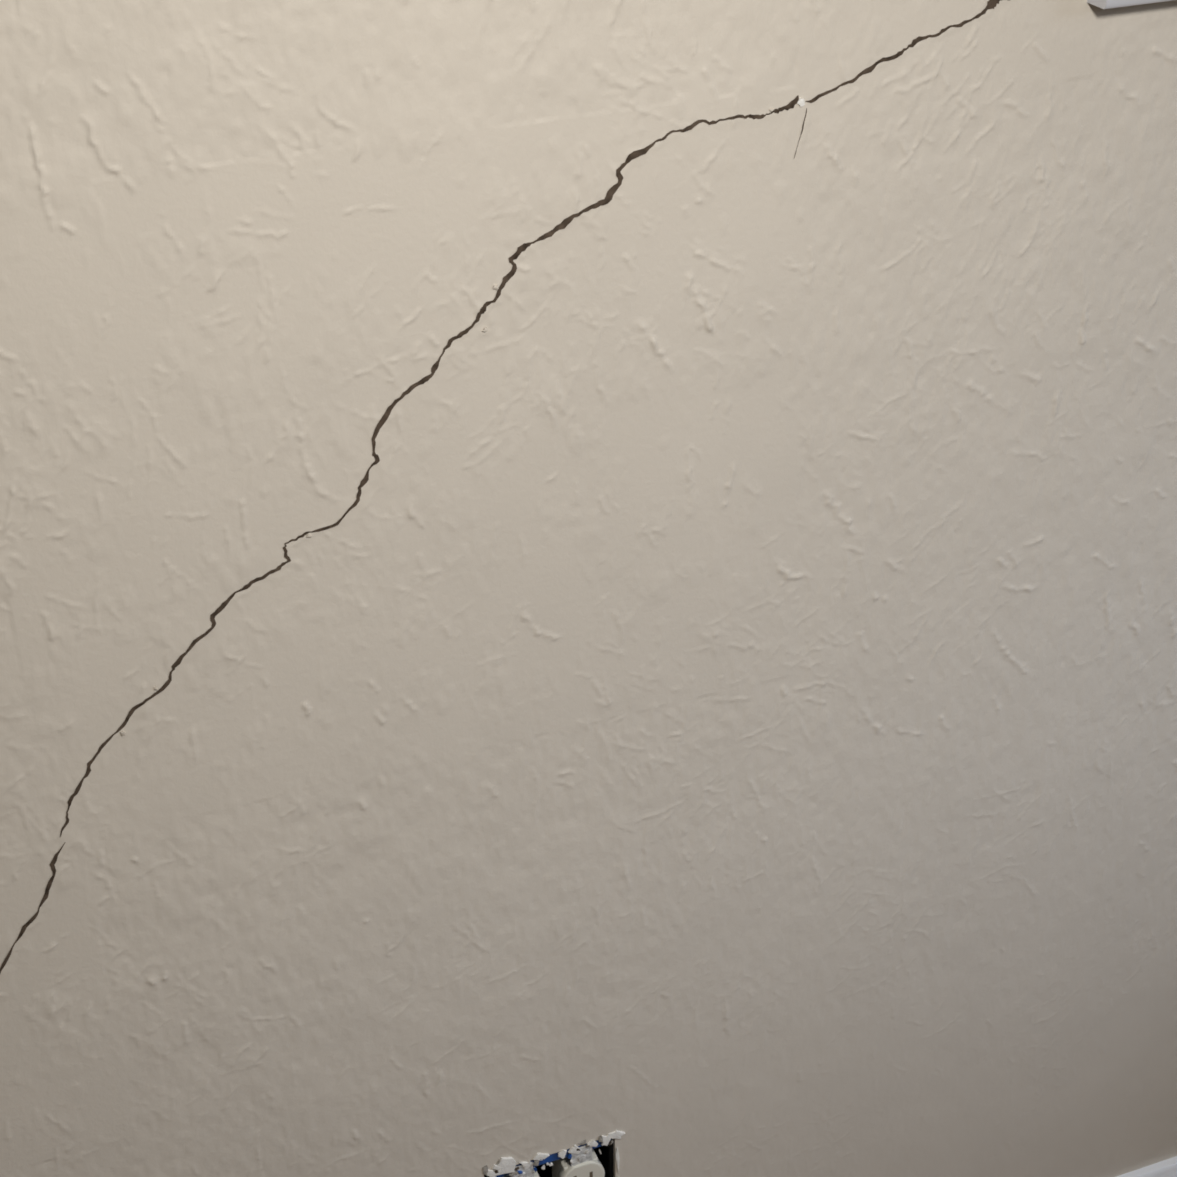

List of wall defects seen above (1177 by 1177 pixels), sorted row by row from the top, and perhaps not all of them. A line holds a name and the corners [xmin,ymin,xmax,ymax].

crack [0,0,1000,973]